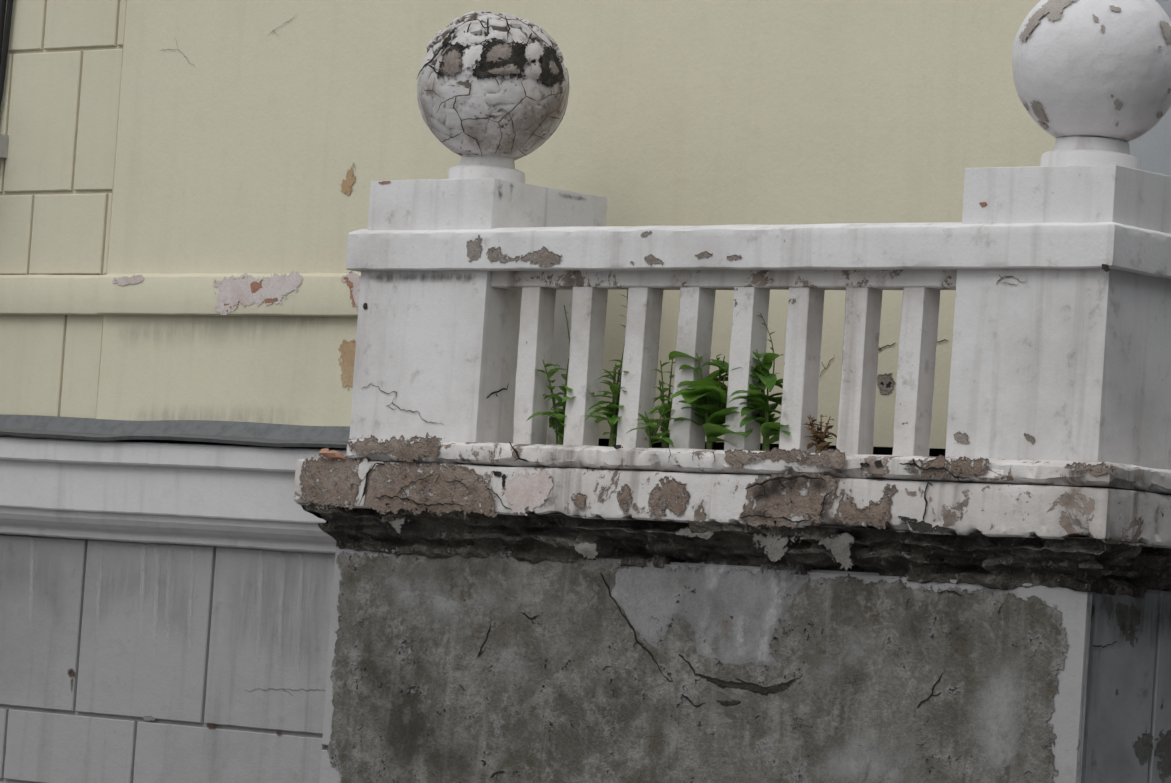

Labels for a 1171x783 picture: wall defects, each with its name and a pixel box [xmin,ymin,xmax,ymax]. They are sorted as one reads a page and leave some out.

crack [417,14,566,156]
spalling [436,27,565,88]
peeling [466,235,562,268]
peeling [213,271,302,315]
peeling [338,339,356,391]
spalling [877,373,895,395]
spalling [299,432,553,534]
spalling [904,431,989,480]
peeling [611,447,951,666]
crack [600,573,802,707]
damp [1104,596,1141,647]
damp [1133,728,1171,783]